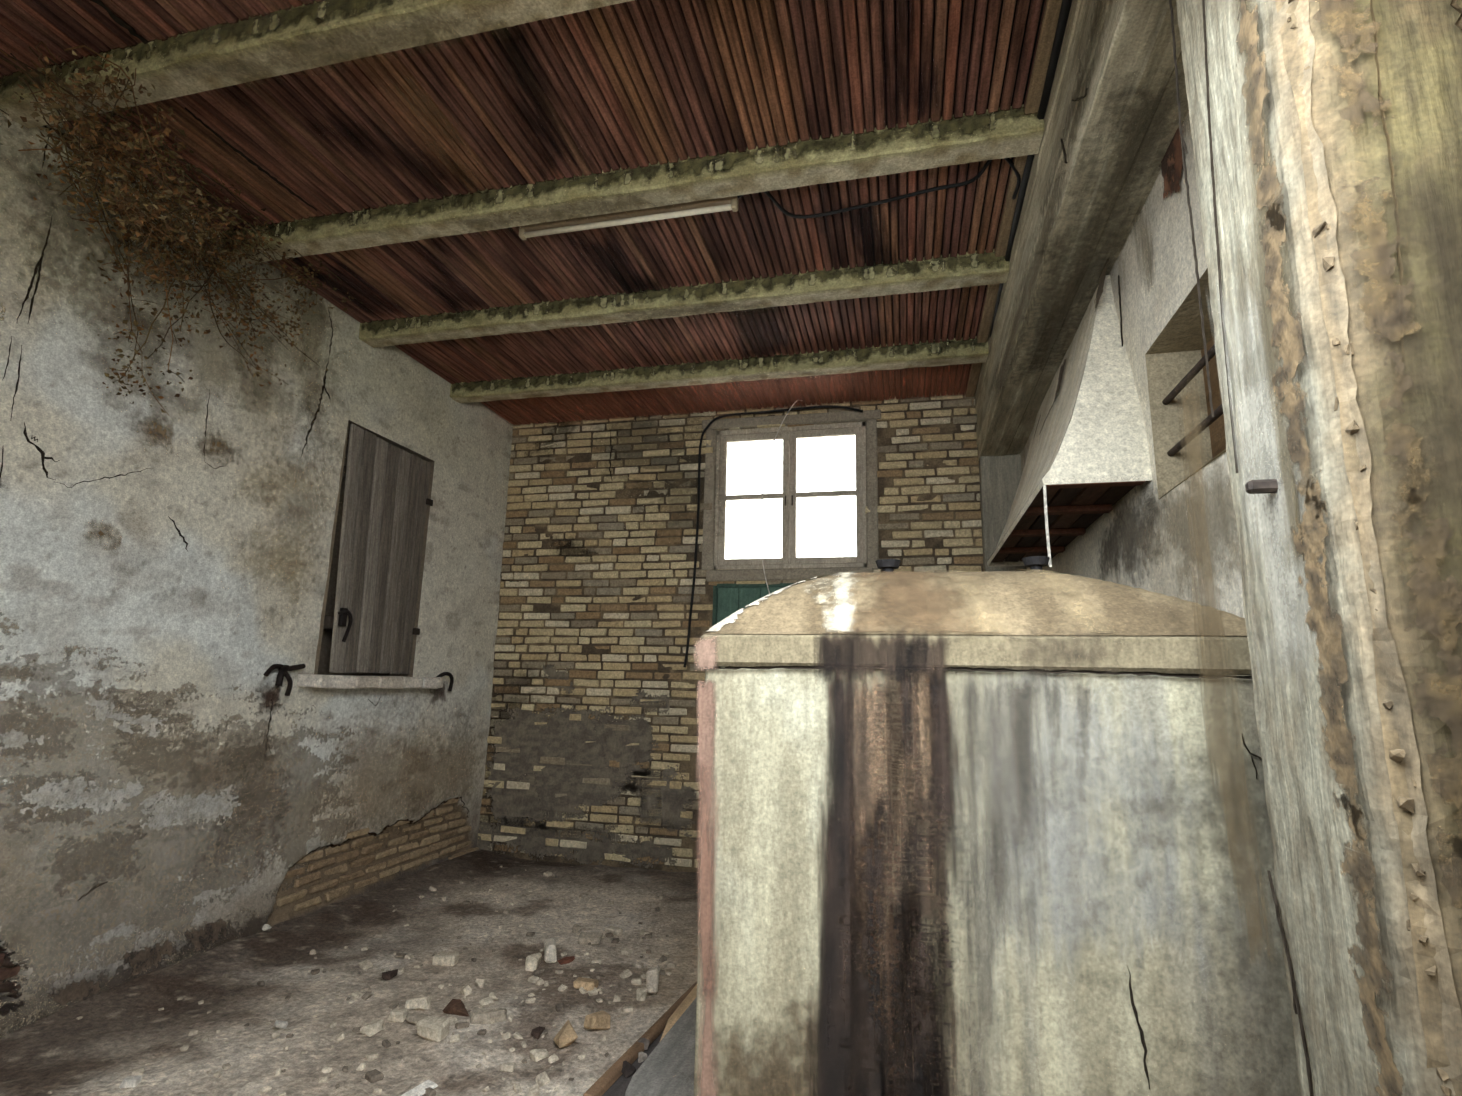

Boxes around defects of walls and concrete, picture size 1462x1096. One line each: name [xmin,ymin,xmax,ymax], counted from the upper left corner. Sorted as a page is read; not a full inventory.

crack [1450,0,1462,30]
crack [0,215,151,488]
spalling [1236,0,1406,1096]
spalling [1312,175,1462,909]
flaking render [276,797,479,911]
water stain [713,571,1033,1096]
crack [1127,966,1150,1090]